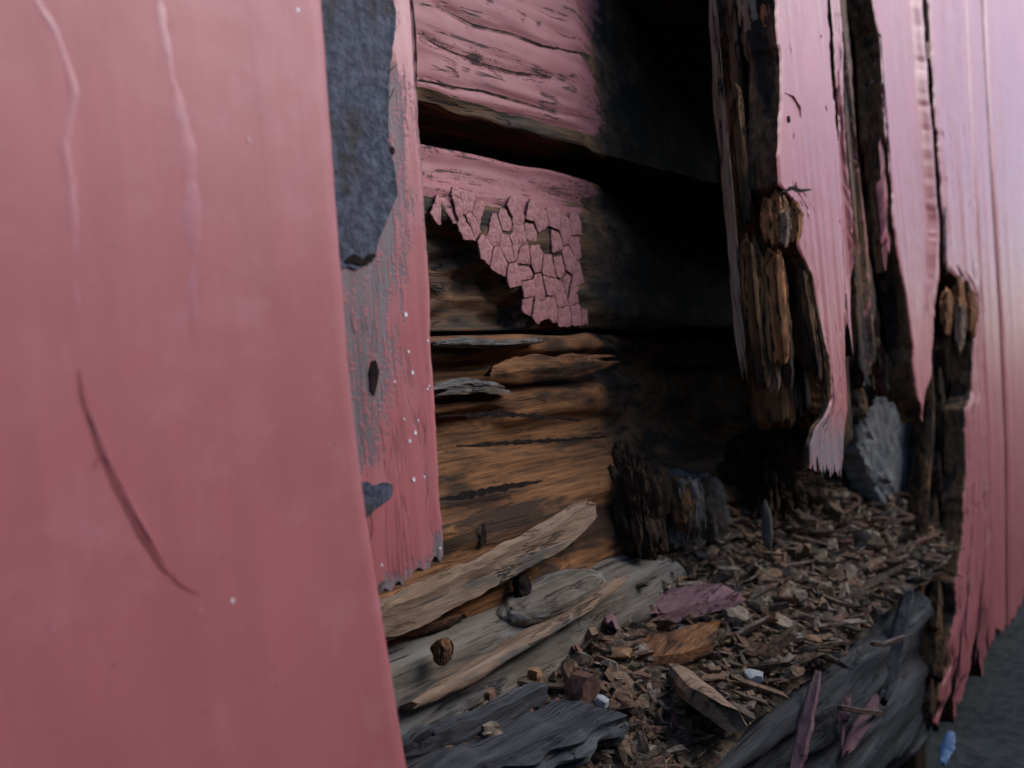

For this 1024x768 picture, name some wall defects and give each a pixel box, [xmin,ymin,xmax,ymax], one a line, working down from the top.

peeling [321,0,398,269]
peeling [429,186,588,327]
crack [79,368,201,595]
peeling [361,481,394,518]